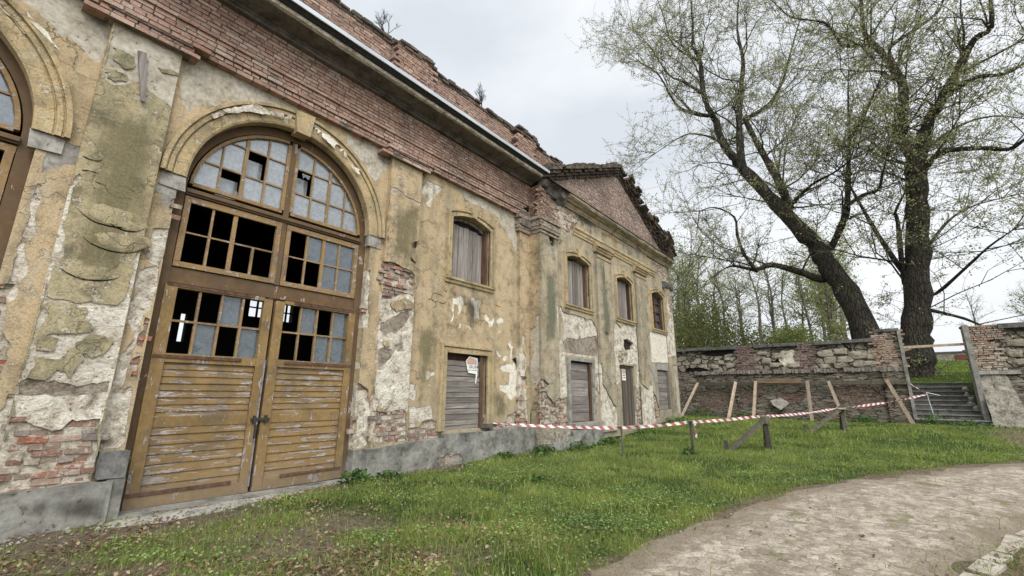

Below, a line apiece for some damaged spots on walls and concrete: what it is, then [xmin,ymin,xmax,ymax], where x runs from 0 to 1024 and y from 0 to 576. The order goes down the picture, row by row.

leakage [98,120,145,211]
leakage [88,219,122,264]
flaking render [0,135,182,493]
flaking render [346,242,440,449]
peeling [451,296,503,333]
flaking render [482,294,735,430]